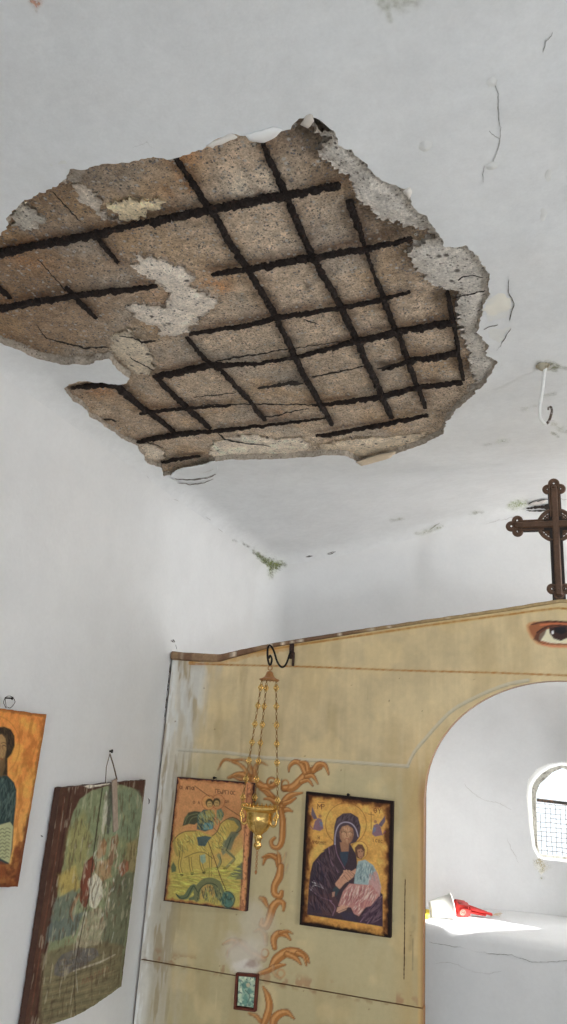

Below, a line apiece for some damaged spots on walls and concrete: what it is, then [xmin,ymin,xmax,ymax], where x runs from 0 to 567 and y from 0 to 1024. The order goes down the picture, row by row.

crack [482,86,501,182]
spalling [0,114,512,483]
crack [452,275,514,350]